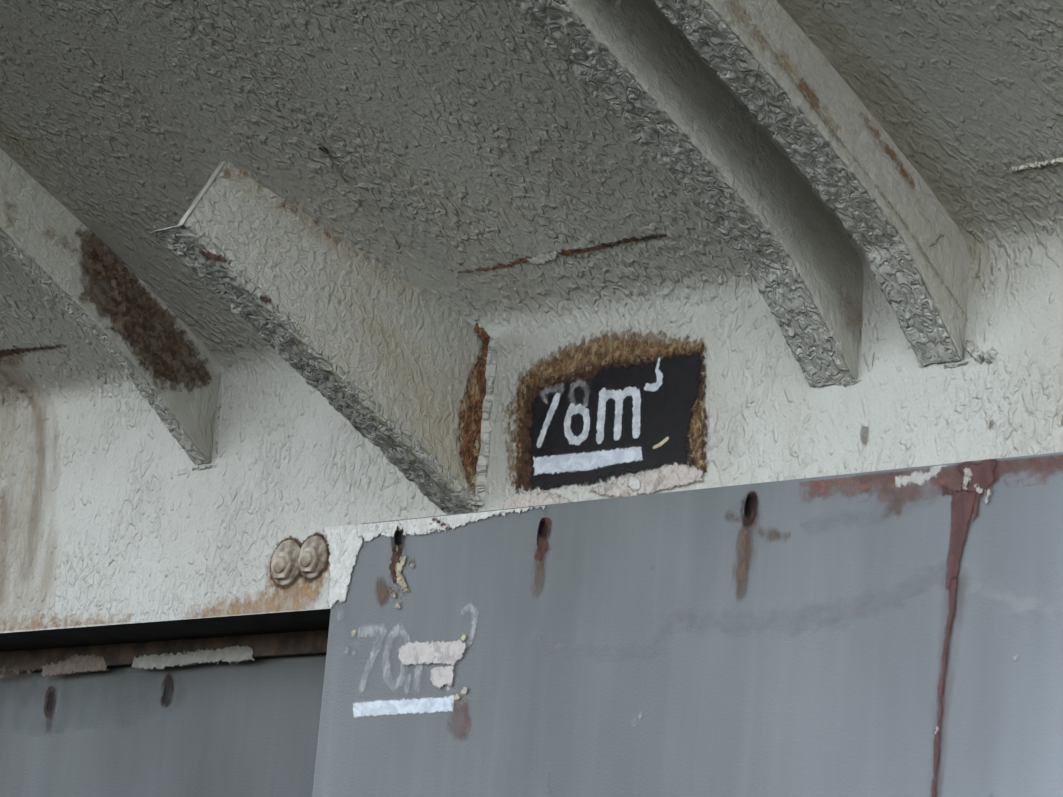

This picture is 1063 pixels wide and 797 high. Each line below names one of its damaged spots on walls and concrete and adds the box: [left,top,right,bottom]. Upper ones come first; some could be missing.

rust [200,250,228,262]
crack [459,234,667,273]
rust [64,229,210,390]
crack [0,344,66,363]
rust [502,330,707,494]
peeling [589,462,703,498]
rust [193,532,330,618]
rust [376,526,415,609]
peeling [323,489,572,609]
rust [535,518,551,588]
rust [736,491,758,594]